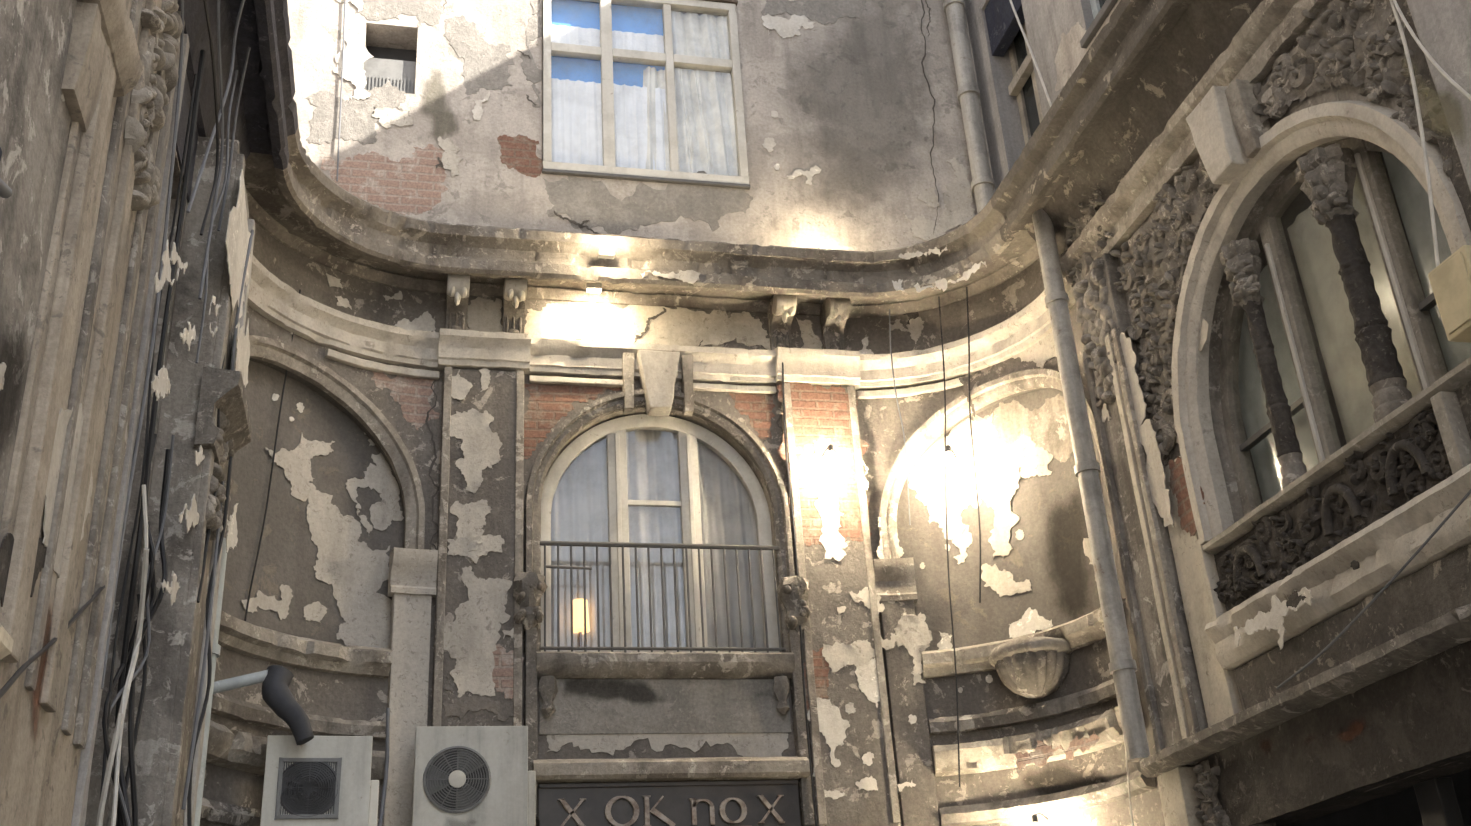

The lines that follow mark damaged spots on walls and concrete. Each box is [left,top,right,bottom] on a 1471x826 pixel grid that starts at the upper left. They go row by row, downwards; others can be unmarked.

flaking render [306,35,463,215]
flaking render [337,0,542,121]
flaking render [497,134,753,235]
crack [921,0,939,233]
peeling [241,402,404,649]
peeling [371,368,524,699]
peeling [546,733,789,757]
flaking render [729,382,904,562]
peeling [837,587,885,615]
peeling [804,612,952,800]
peeling [908,393,1073,638]
peeling [1234,587,1313,650]